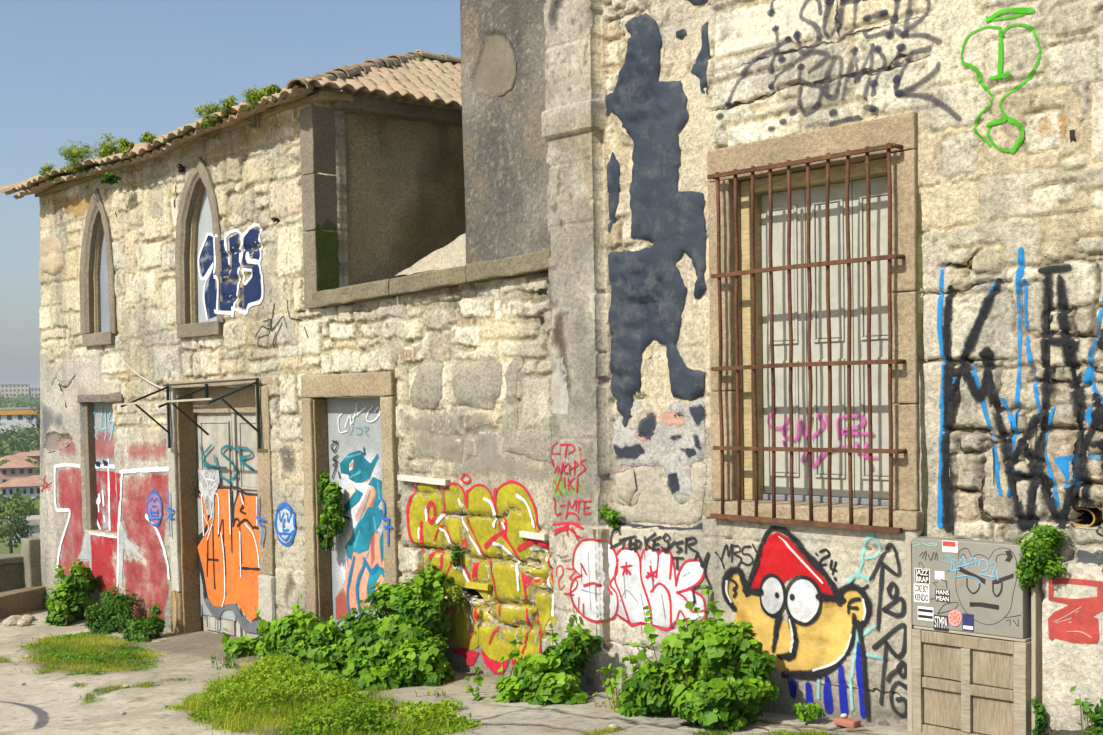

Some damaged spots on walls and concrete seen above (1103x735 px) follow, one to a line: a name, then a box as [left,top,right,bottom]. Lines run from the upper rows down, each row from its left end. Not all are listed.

peeling [685,0,710,12]
peeling [605,9,710,525]
spalling [44,432,72,453]